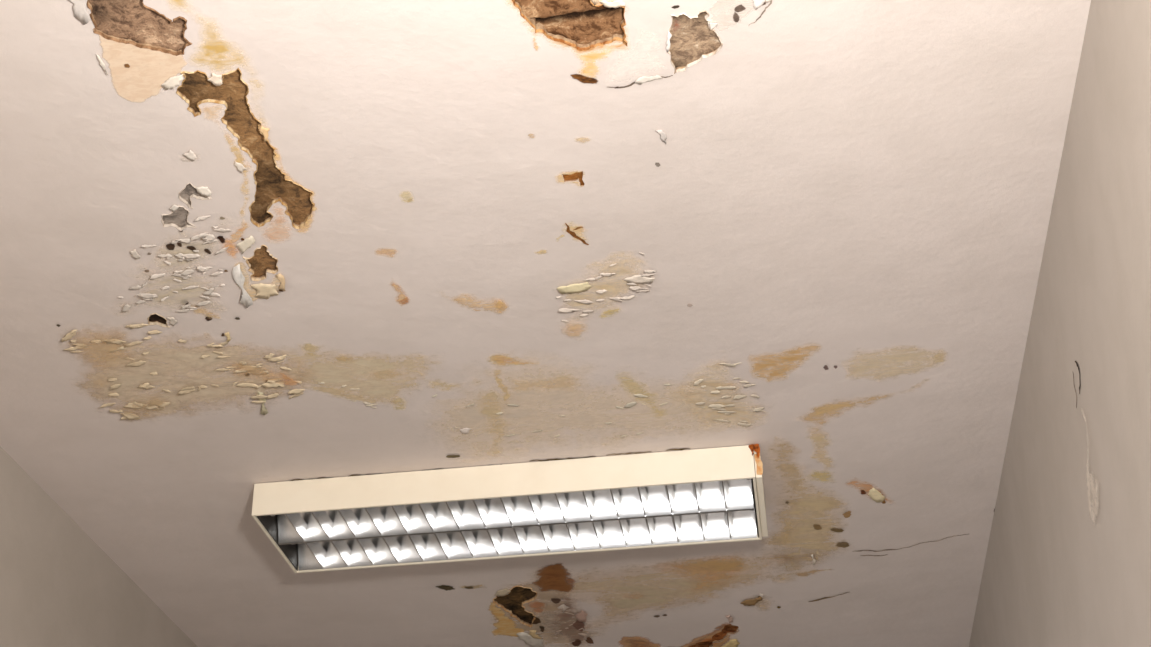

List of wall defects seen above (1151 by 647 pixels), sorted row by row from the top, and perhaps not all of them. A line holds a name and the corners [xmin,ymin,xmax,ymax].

spalling [510,0,772,88]
spalling [57,0,316,420]
peeling [556,252,657,336]
leakage [753,346,817,380]
crack [1072,361,1080,408]
spalling [489,563,594,647]